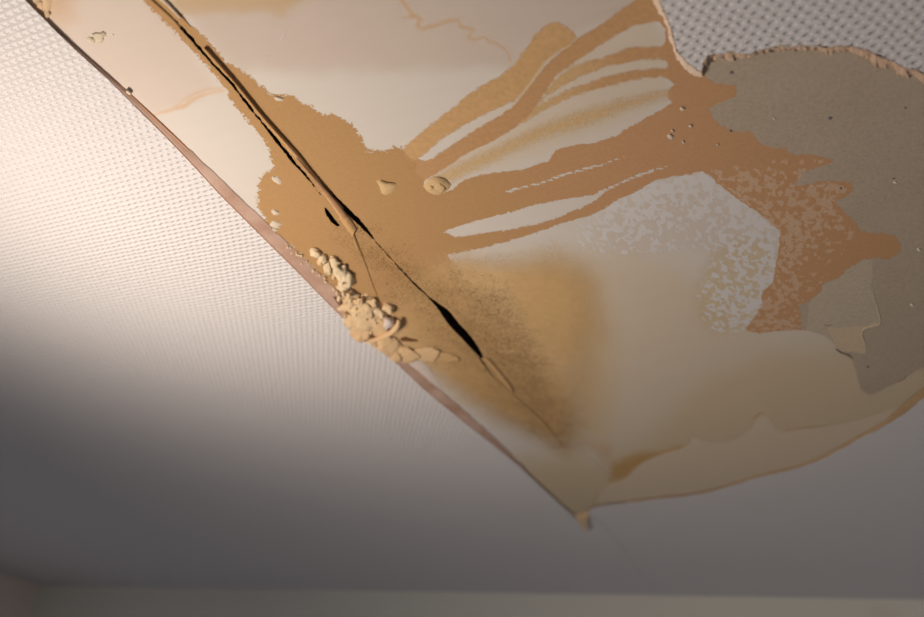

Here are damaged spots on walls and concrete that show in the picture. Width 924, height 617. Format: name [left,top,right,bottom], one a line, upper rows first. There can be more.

crack [151,0,574,448]
spalling [285,243,460,388]
damp [144,0,901,464]